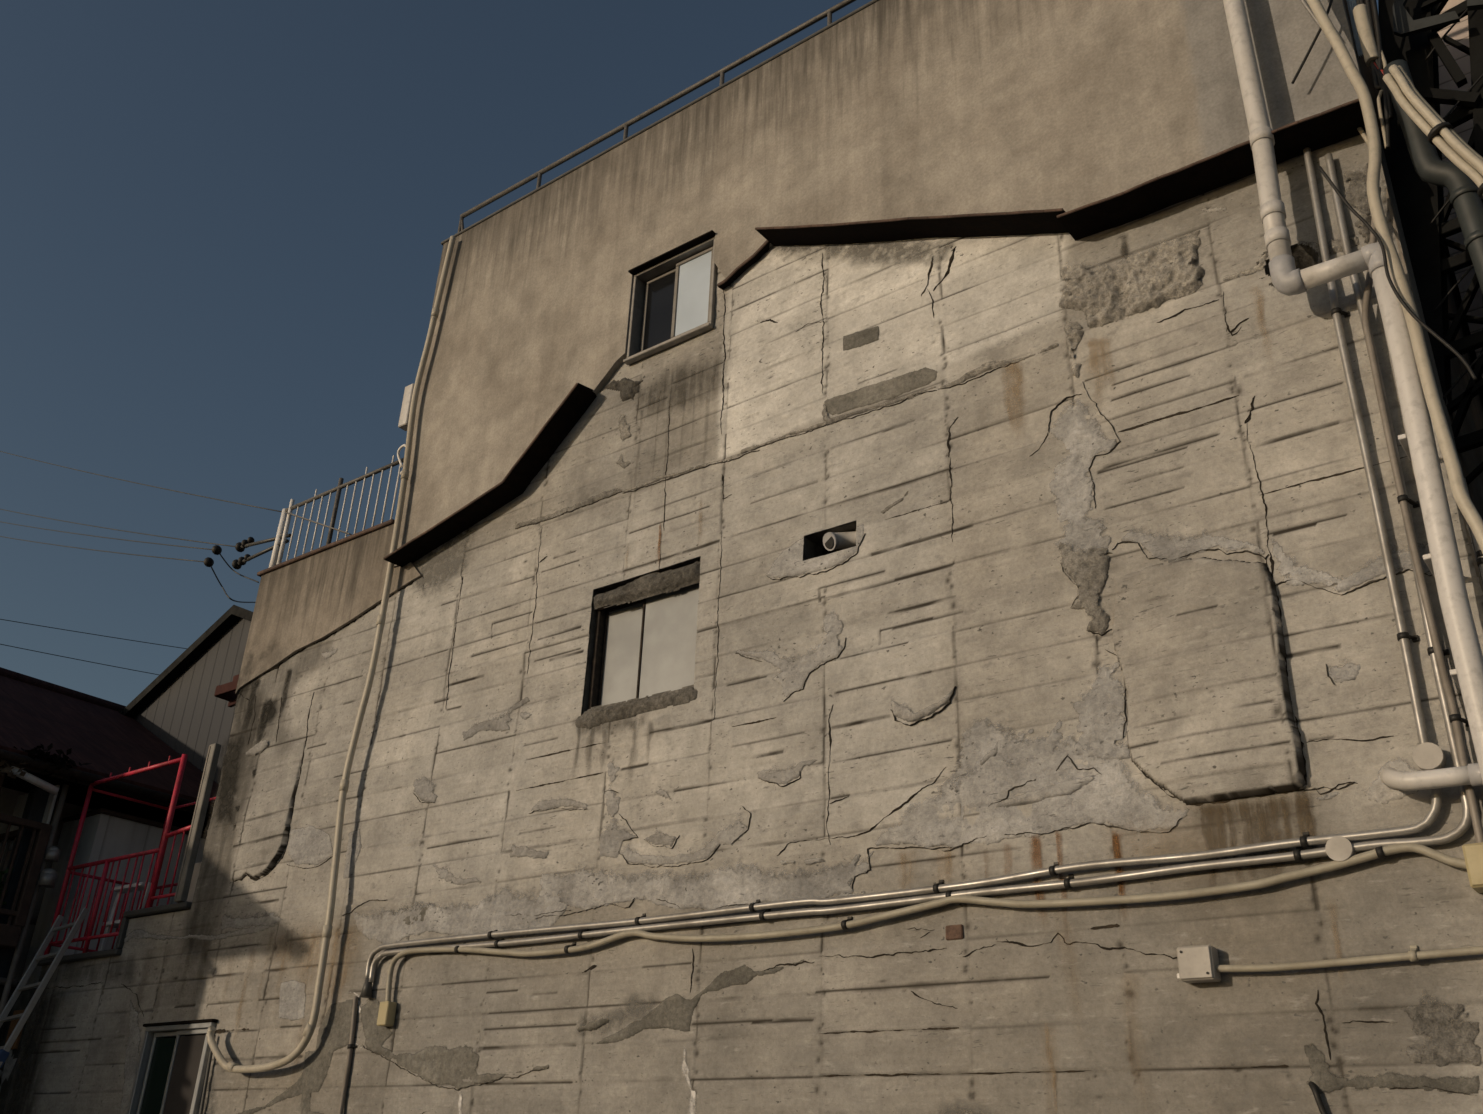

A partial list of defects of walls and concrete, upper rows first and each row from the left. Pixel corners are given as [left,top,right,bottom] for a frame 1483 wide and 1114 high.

spalling [1223,251,1274,287]
spalling [515,230,1205,529]
leakage [235,670,291,739]
leakage [218,741,256,828]
peeling [996,776,1094,808]
peeling [578,1019,608,1032]
spalling [1401,995,1481,1067]
leakage [682,1051,696,1114]